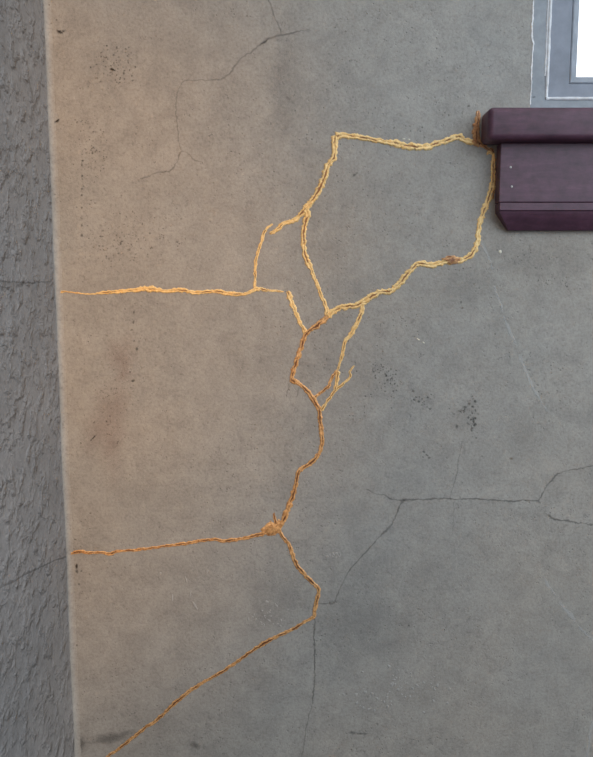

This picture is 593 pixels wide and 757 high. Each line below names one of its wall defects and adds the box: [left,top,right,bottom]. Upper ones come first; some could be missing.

crack [60,110,496,757]